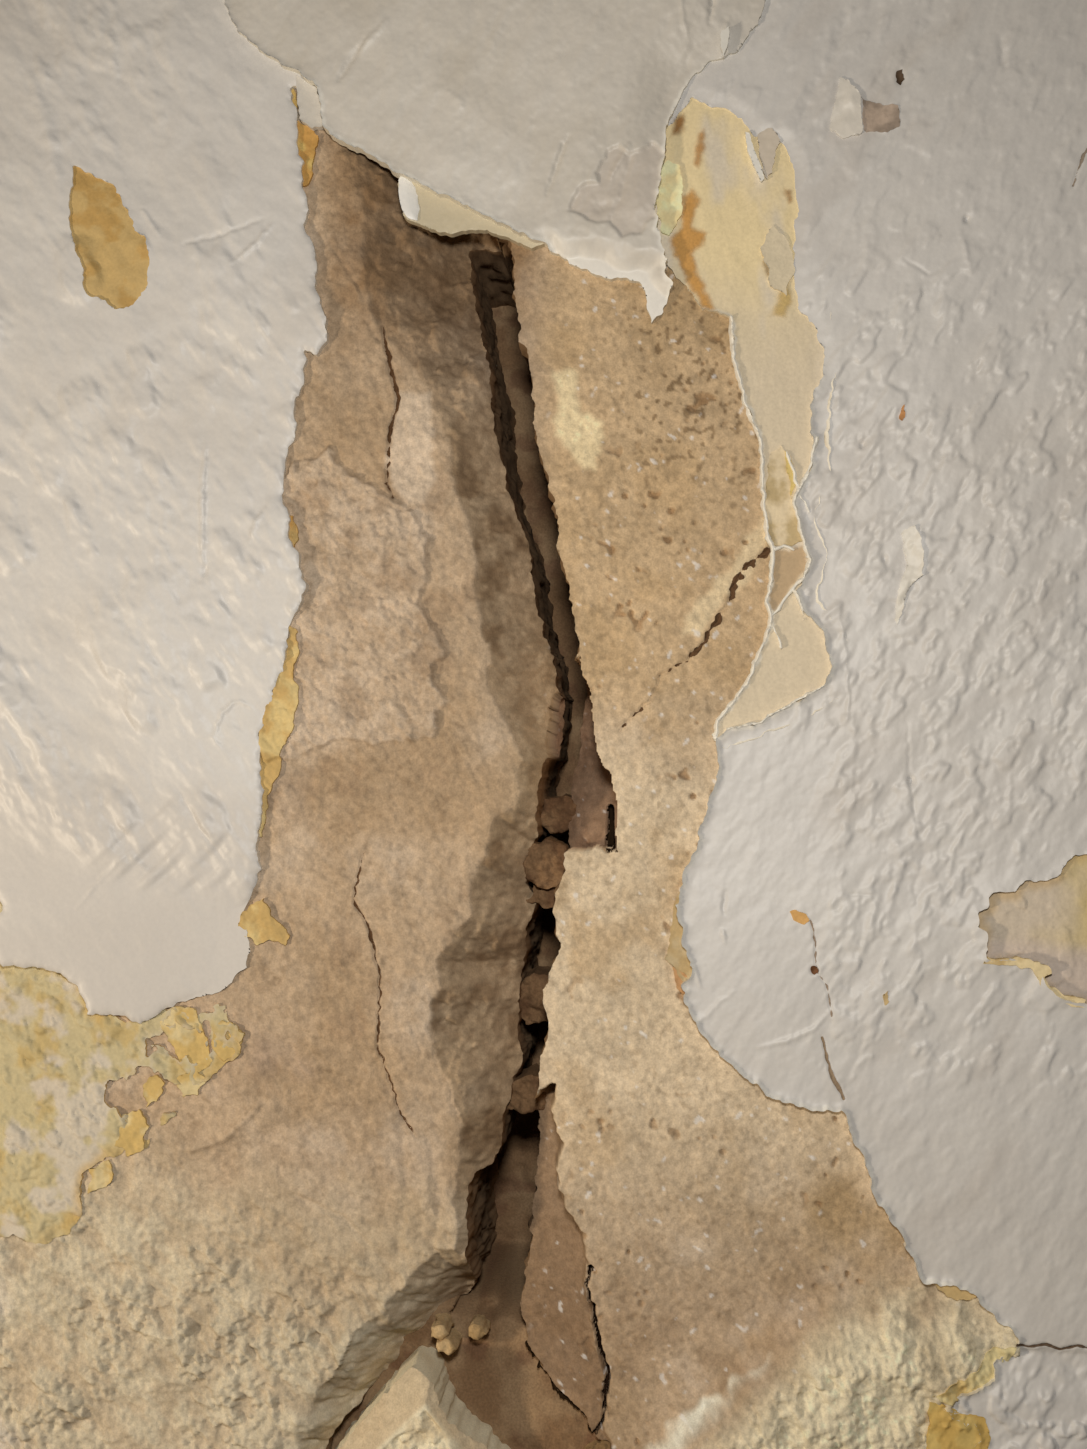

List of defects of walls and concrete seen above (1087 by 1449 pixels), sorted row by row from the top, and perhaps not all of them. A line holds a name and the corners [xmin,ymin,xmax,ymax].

peeling [69,166,150,309]
flaking render [225,0,766,325]
peeling [655,98,831,741]
crack [492,305,588,796]
peeling [0,965,246,1244]
flaking render [258,626,300,837]
crack [532,1021,549,1065]
crack [536,908,561,967]
crack [551,832,570,846]
crack [606,804,615,853]
peeling [978,854,1087,1008]
crack [331,1110,610,1449]